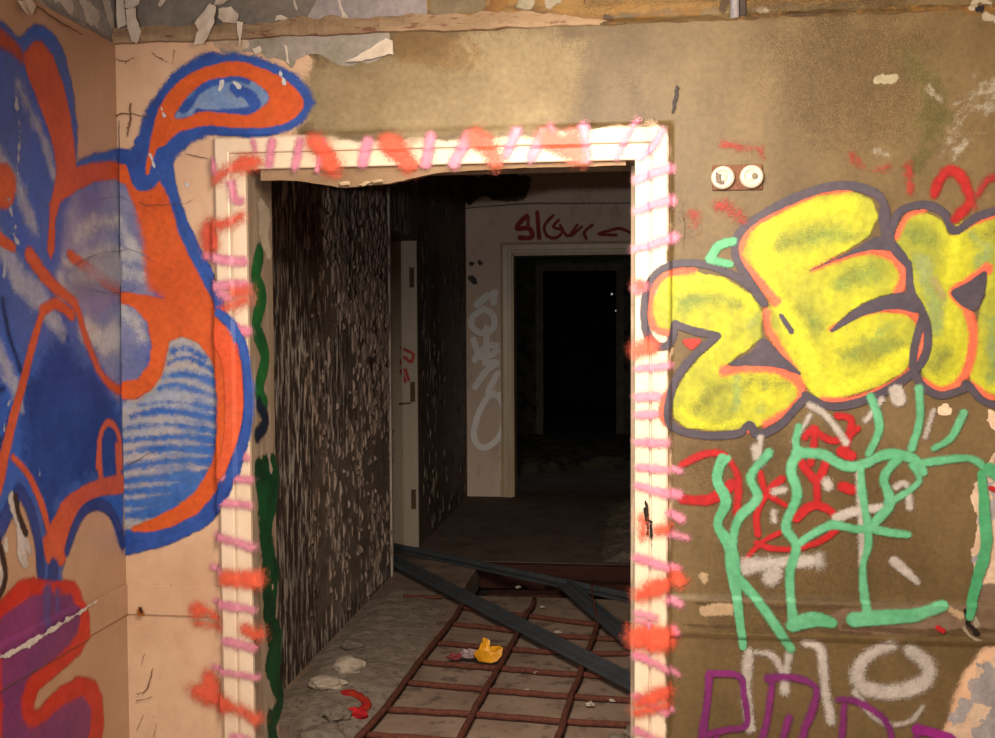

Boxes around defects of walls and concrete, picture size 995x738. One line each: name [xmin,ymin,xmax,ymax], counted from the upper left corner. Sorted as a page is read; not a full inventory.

peeling [194,0,394,85]
peeling [515,0,561,10]
spalling [968,0,995,23]
leakage [291,0,995,738]
peeling [937,403,952,416]
peeling [987,409,995,430]
peeling [970,474,995,586]
peeling [946,658,995,738]